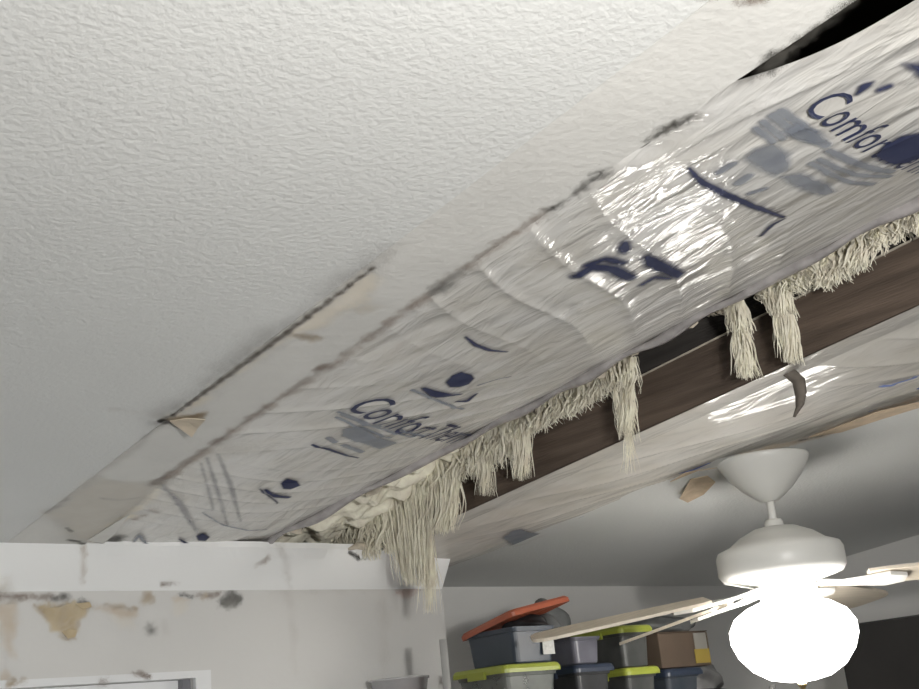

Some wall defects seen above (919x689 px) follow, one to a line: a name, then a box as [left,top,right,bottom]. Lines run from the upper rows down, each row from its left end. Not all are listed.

water stain [749,0,861,80]
water stain [637,110,707,146]
water stain [539,166,618,214]
peeling [680,476,715,503]
peeling [32,591,157,642]
water stain [197,590,245,612]